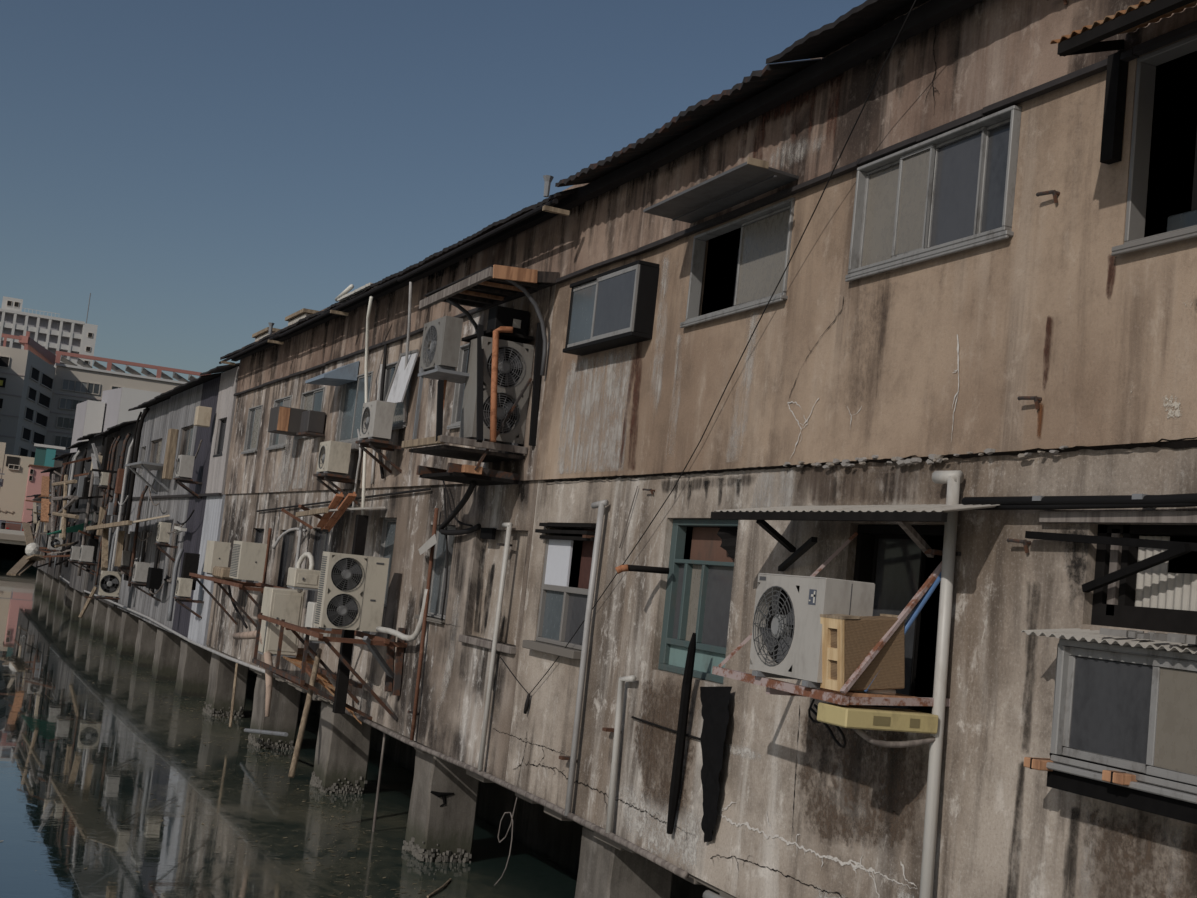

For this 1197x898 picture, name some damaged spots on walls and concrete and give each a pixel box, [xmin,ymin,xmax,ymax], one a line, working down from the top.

corrosion [1043,317,1051,379]
water stain [1068,809,1197,898]